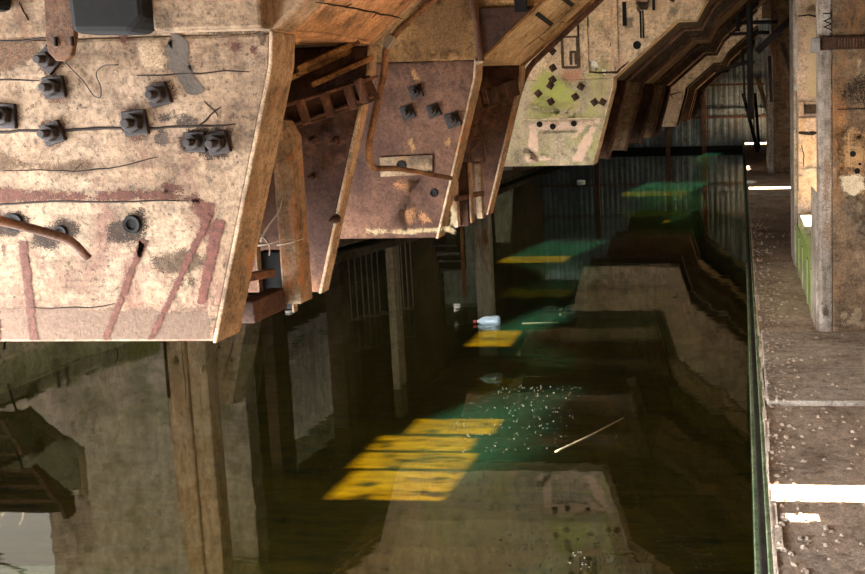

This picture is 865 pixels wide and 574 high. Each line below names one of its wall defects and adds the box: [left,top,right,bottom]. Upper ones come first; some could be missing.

rust [392,176,432,226]
damp [0,208,84,252]
damp [104,207,154,251]
rust [0,179,225,341]
damp [142,245,211,287]
damp [0,299,214,340]